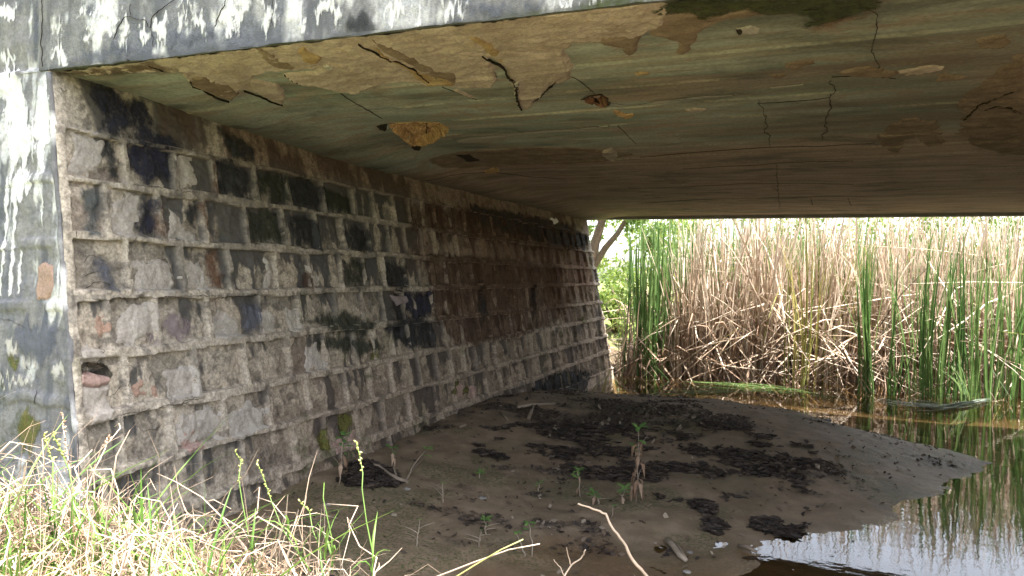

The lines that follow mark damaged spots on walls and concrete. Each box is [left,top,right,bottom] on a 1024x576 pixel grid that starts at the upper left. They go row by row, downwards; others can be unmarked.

leakage [65,41,179,185]
peeling [51,0,762,110]
spalling [376,121,450,151]
crack [358,43,477,100]
crack [482,56,594,111]
crack [618,76,871,211]
crack [870,10,896,79]
peeling [955,53,1024,155]
leakage [0,175,23,296]
leakage [216,127,371,289]
spalling [80,259,212,424]
leakage [304,262,436,358]